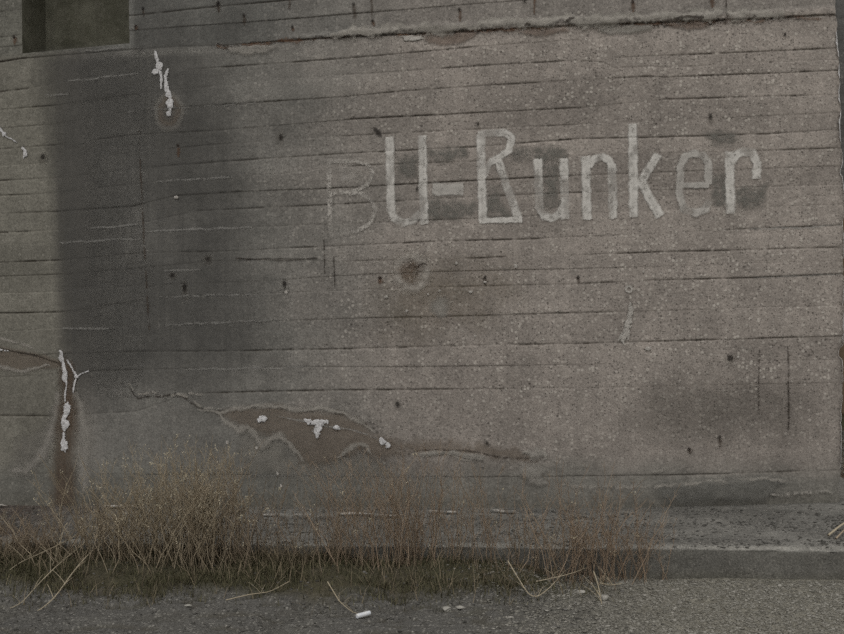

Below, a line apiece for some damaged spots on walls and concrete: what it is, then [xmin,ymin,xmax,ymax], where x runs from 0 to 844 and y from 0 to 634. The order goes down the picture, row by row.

crack [217,7,837,48]
leakage [144,50,207,207]
leakage [12,56,103,504]
crack [129,383,220,411]